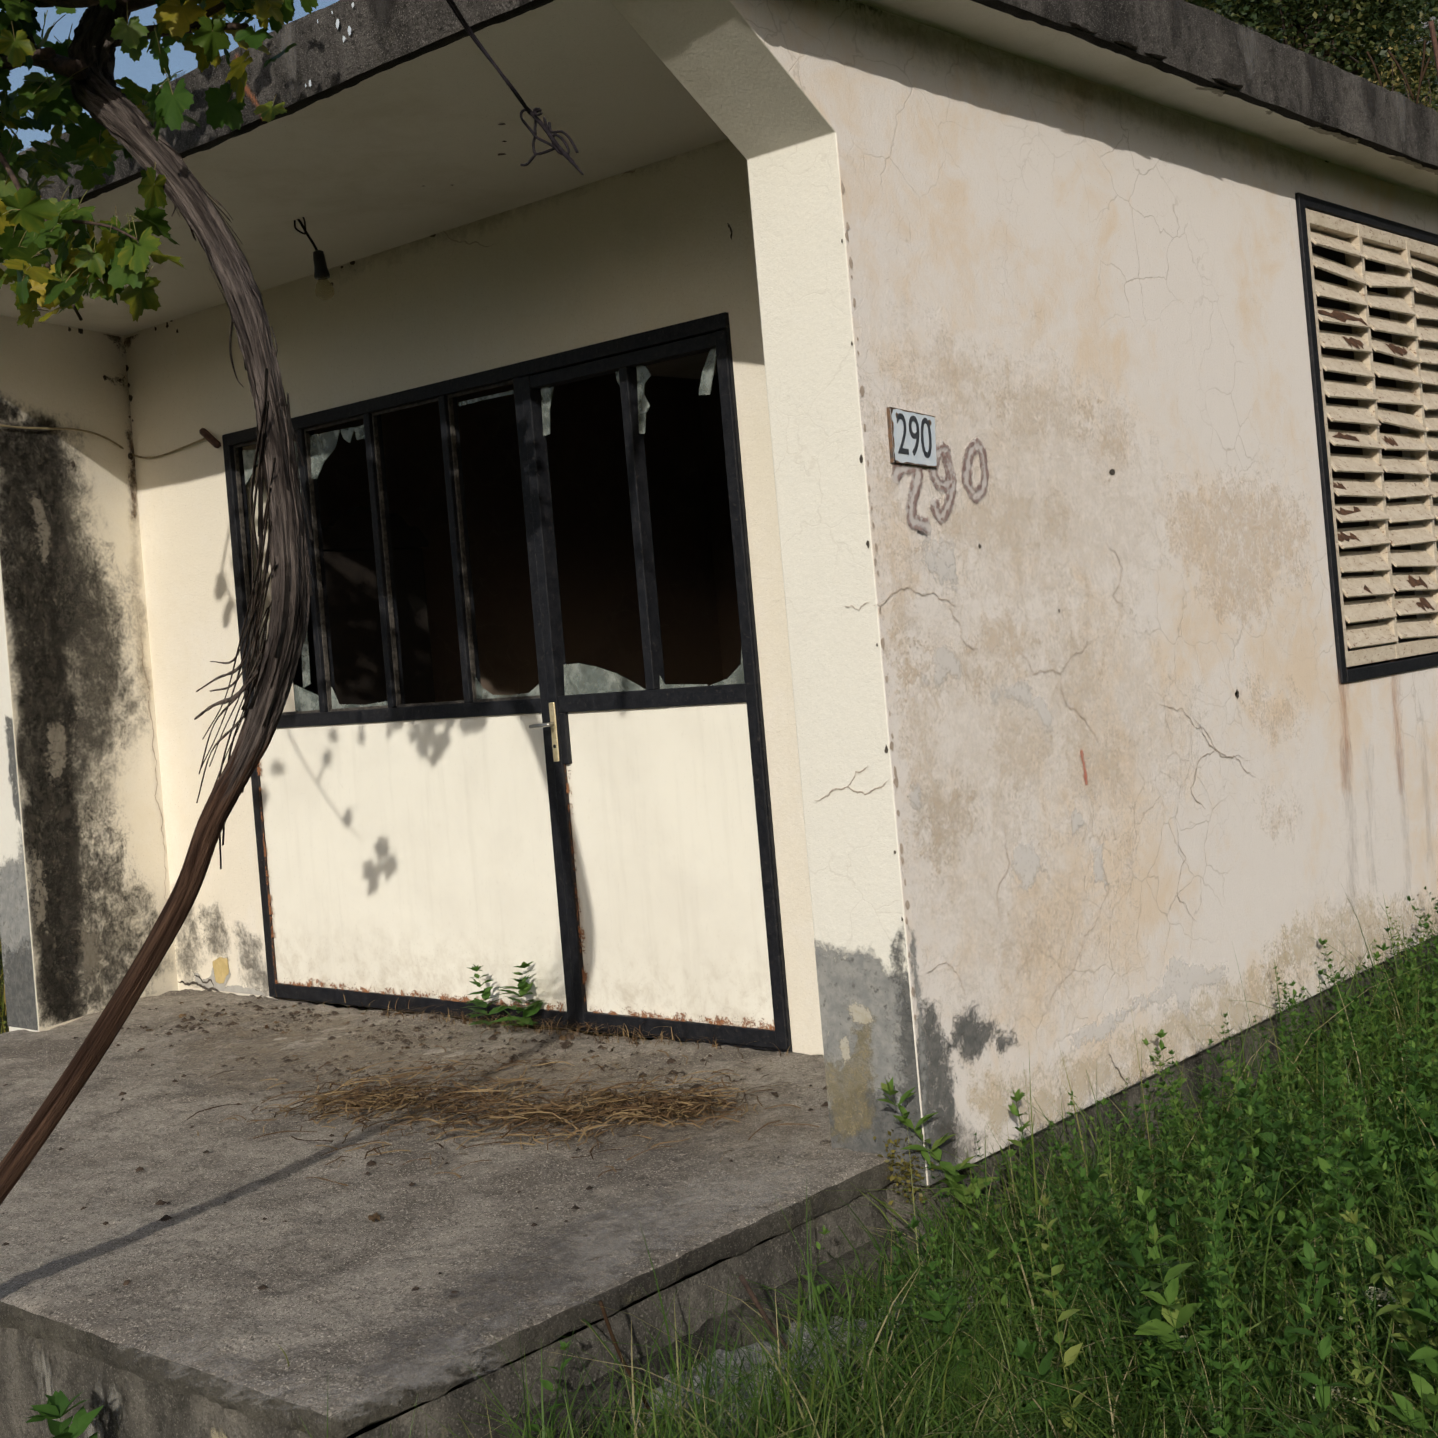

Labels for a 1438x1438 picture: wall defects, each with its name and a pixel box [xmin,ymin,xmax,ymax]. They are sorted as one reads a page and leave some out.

leakage [103,334,137,518]
leakage [0,396,157,1031]
leakage [178,911,268,993]
corrosion [257,762,564,1012]
crack [814,767,888,801]
leakage [814,932,1017,1186]
crack [1166,706,1256,921]